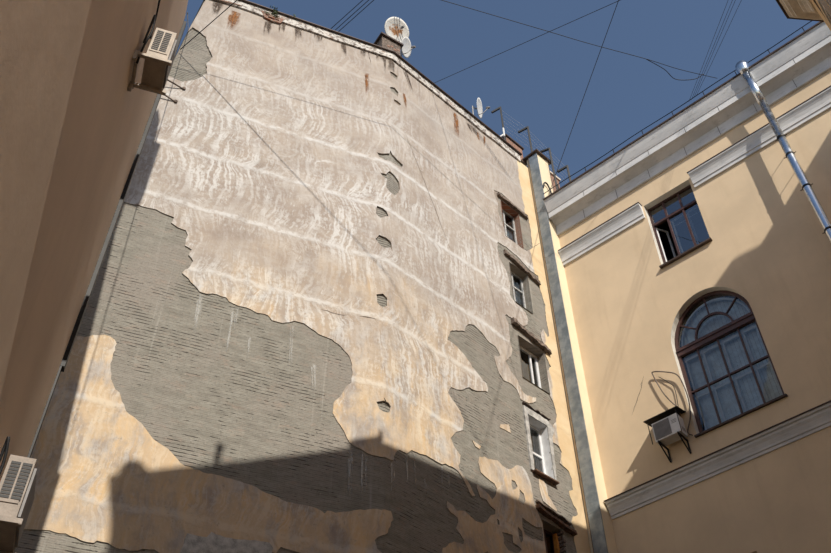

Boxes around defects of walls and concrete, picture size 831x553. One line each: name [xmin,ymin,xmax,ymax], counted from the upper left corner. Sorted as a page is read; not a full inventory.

flaking render [169,27,212,82]
flaking render [77,190,578,553]
flaking render [14,529,159,553]